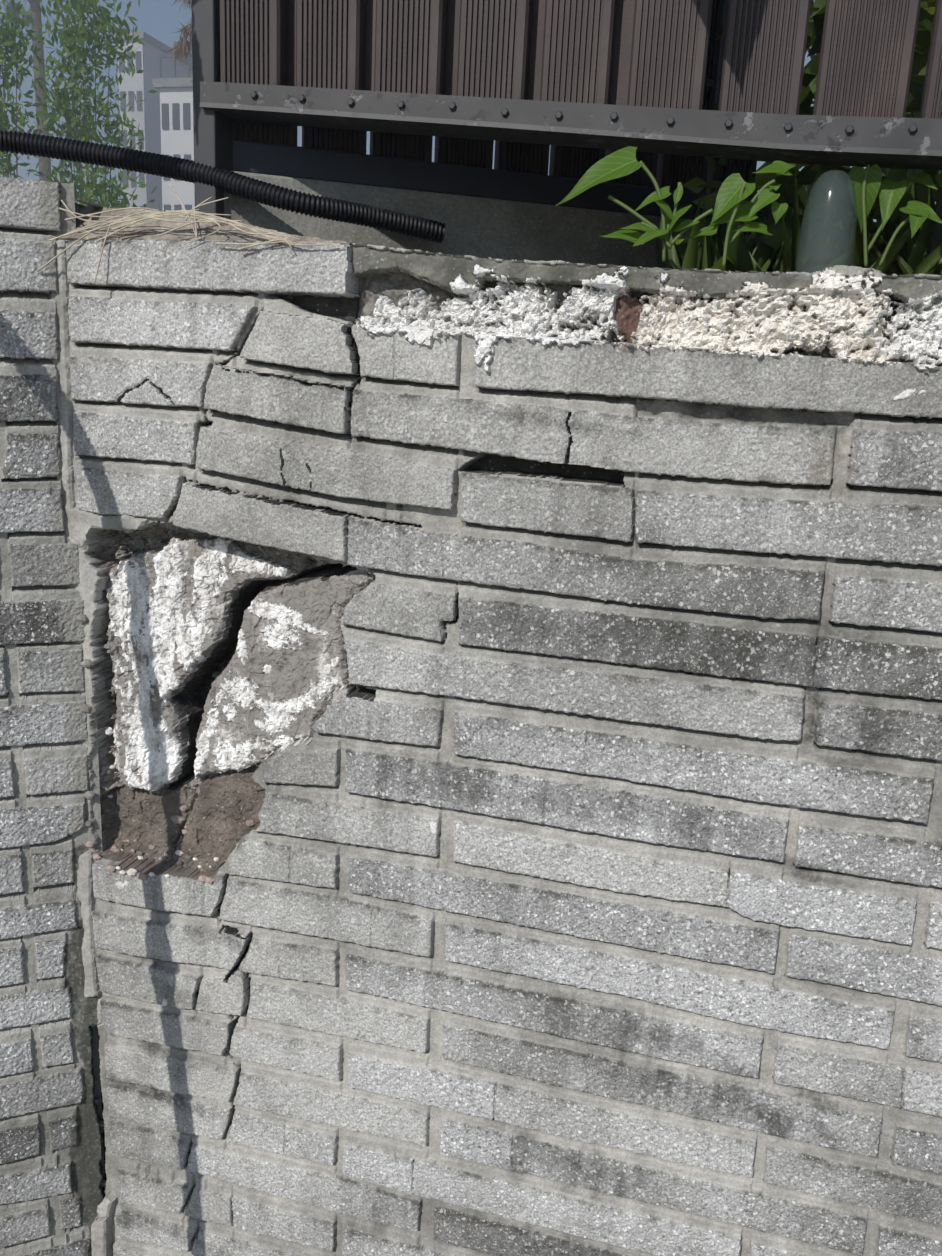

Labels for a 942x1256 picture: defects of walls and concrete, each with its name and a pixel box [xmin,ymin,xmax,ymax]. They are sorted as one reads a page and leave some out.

peeling [354,265,942,375]
crack [118,380,174,404]
crack [221,327,361,439]
crack [183,456,422,528]
crack [565,413,573,463]
spalling [76,522,376,884]
crack [194,874,253,1137]